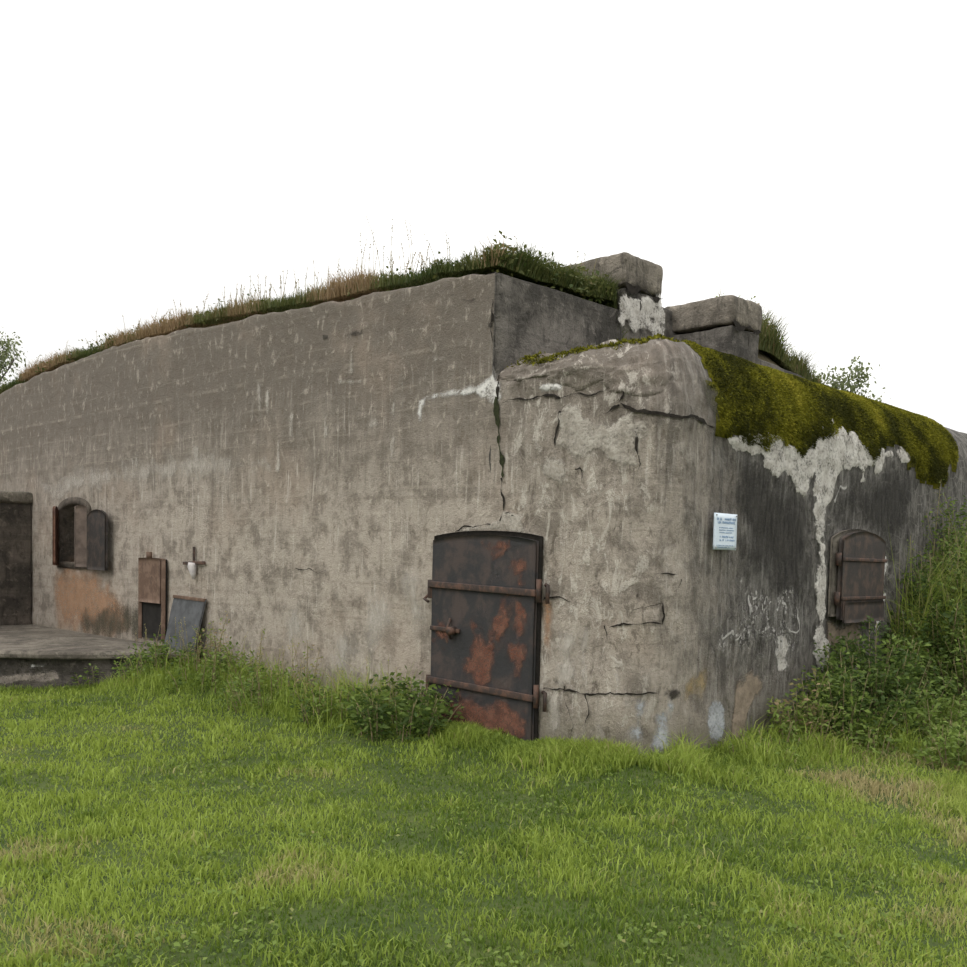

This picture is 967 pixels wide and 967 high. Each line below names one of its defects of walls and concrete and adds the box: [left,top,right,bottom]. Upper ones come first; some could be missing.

peeling [618,294,665,335]
leakage [418,375,501,417]
crack [455,375,714,532]
peeling [727,418,910,672]
corrosion [463,601,526,686]
crack [604,603,665,635]
corrosion [439,696,525,738]
crack [543,686,655,738]